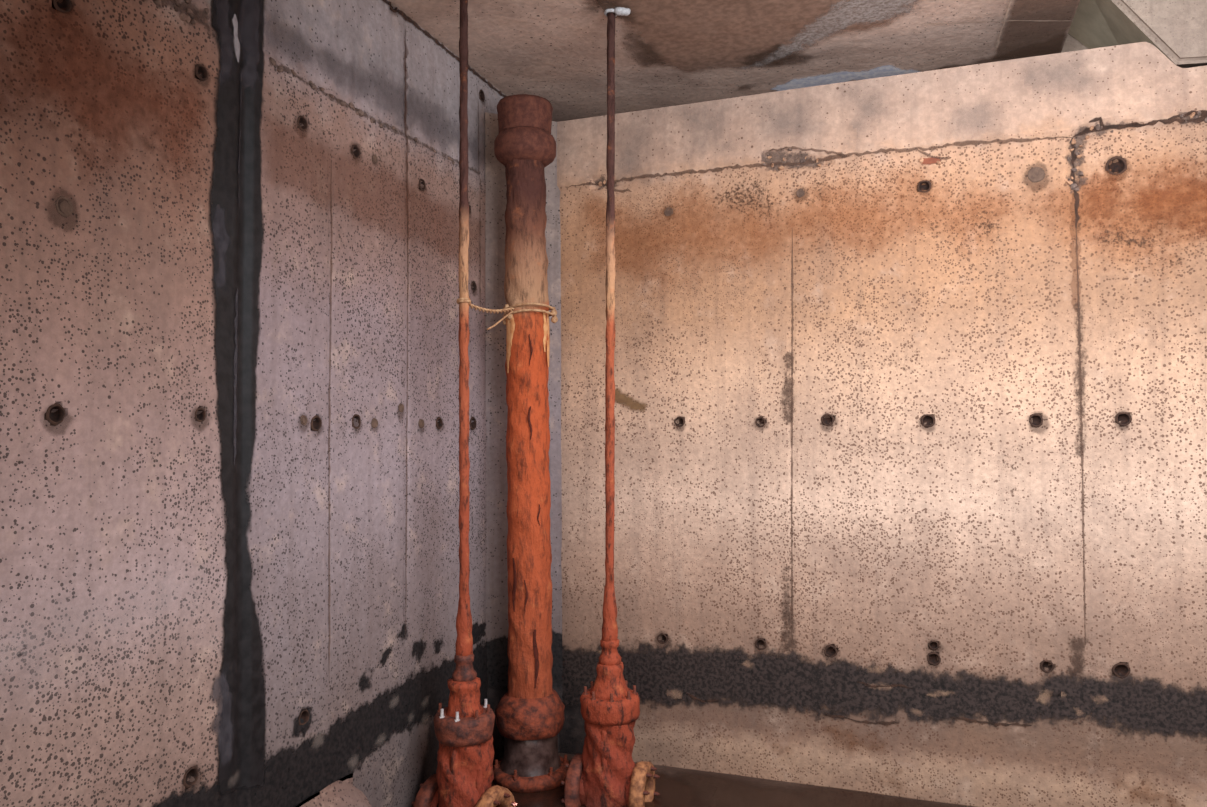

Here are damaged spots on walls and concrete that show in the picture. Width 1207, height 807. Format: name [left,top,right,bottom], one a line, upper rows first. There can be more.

leakage [595,0,917,72]
leakage [772,65,920,91]
crack [569,110,1207,674]